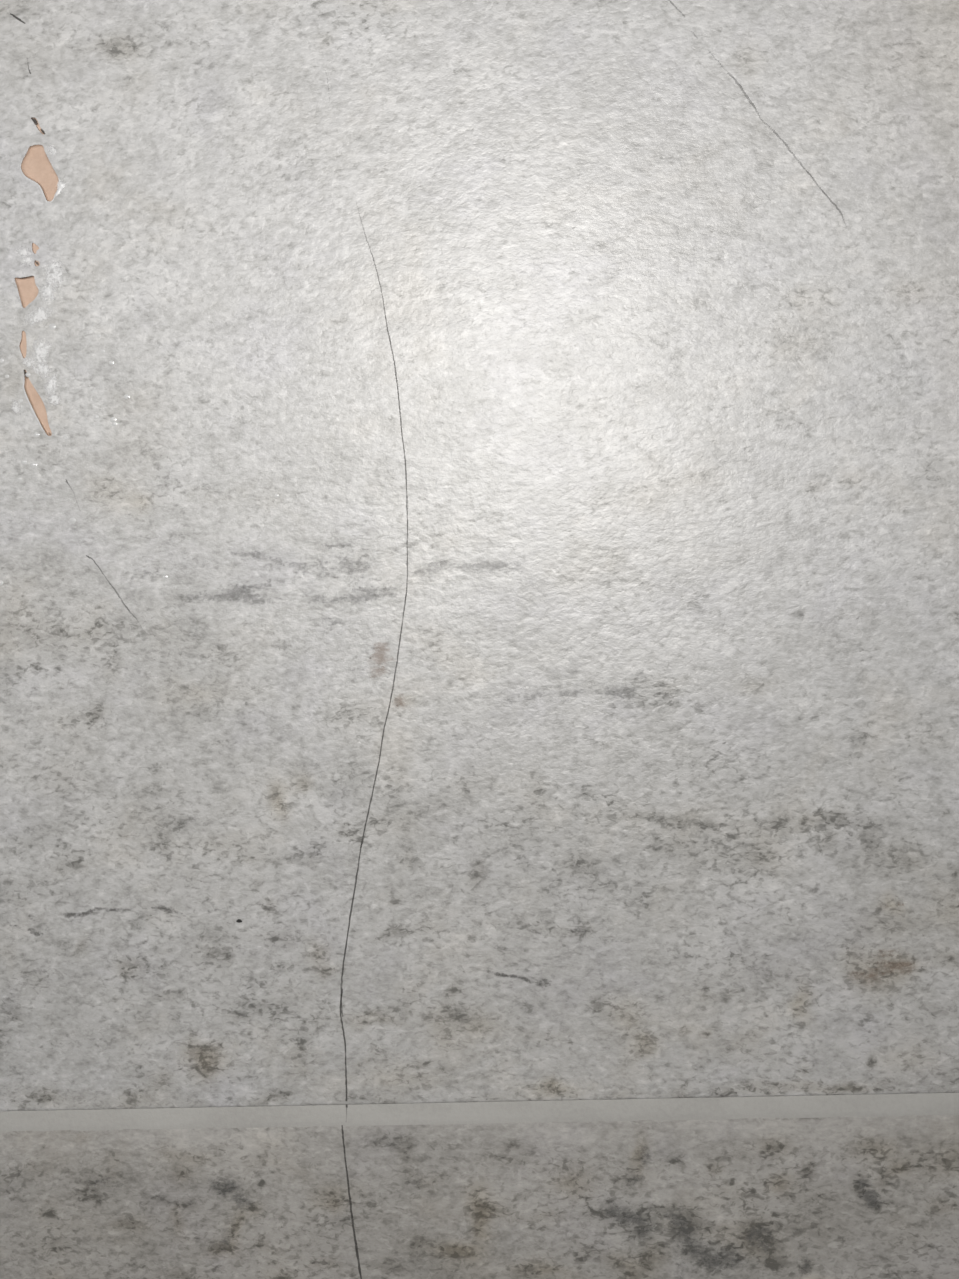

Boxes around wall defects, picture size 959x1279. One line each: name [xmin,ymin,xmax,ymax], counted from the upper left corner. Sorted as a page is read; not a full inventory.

spalling [19,117,65,203]
spalling [11,243,62,436]
crack [340,317,408,1279]